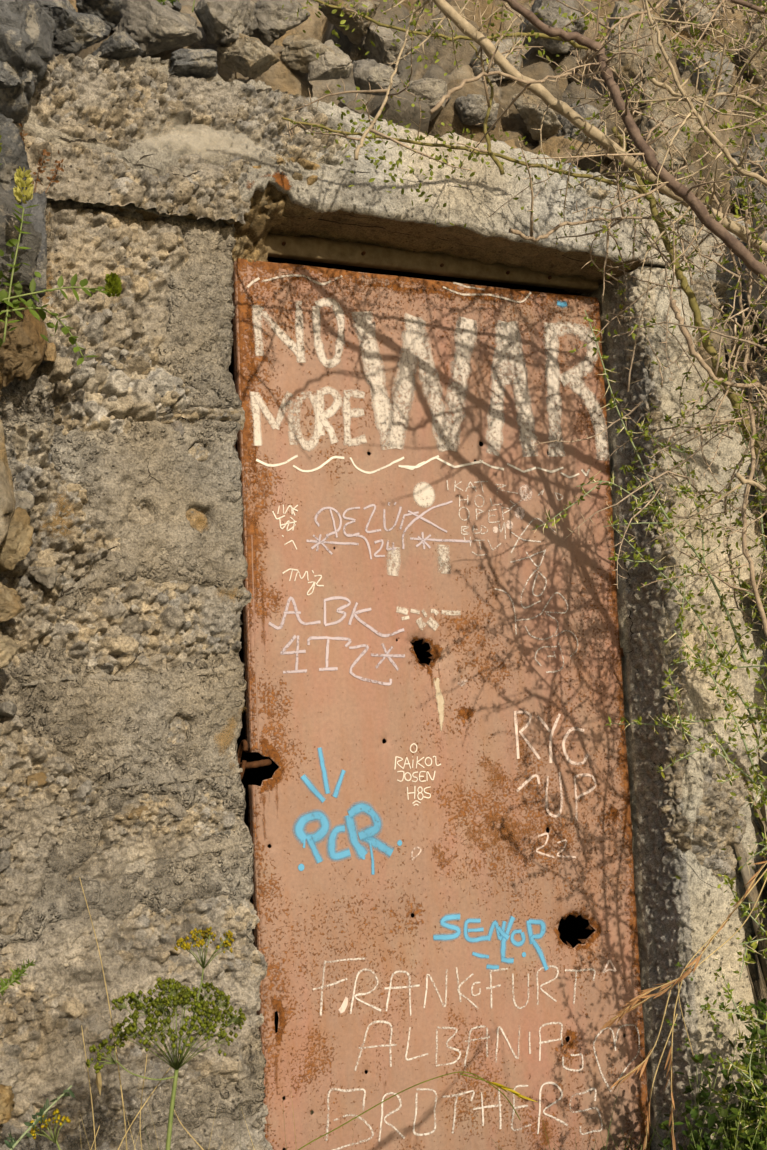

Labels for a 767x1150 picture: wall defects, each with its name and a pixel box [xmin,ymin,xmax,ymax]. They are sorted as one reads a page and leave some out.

corrosion [245,295,257,398]
corrosion [248,426,259,502]
corrosion [410,637,443,684]
corrosion [257,737,284,804]
corrosion [465,812,545,861]
corrosion [554,910,608,957]